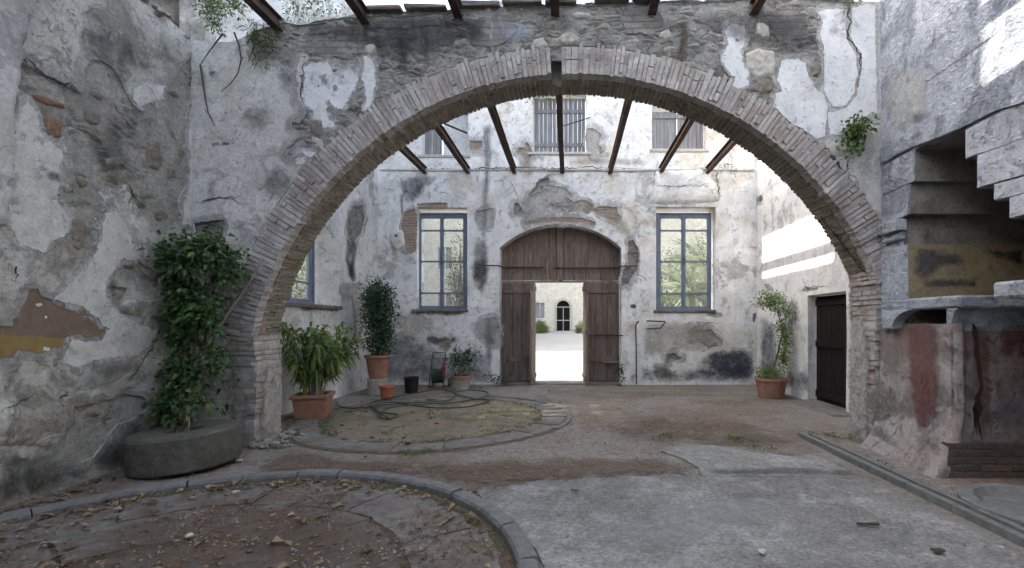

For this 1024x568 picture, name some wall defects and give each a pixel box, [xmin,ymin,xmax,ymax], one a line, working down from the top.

crack [846,2,862,86]
spalling [246,0,882,166]
spalling [0,52,228,376]
spalling [399,202,448,254]
spalling [509,176,623,229]
water stain [346,242,357,282]
spalling [618,236,640,289]
crack [128,344,154,381]
water stain [644,322,807,387]
crack [972,324,984,440]